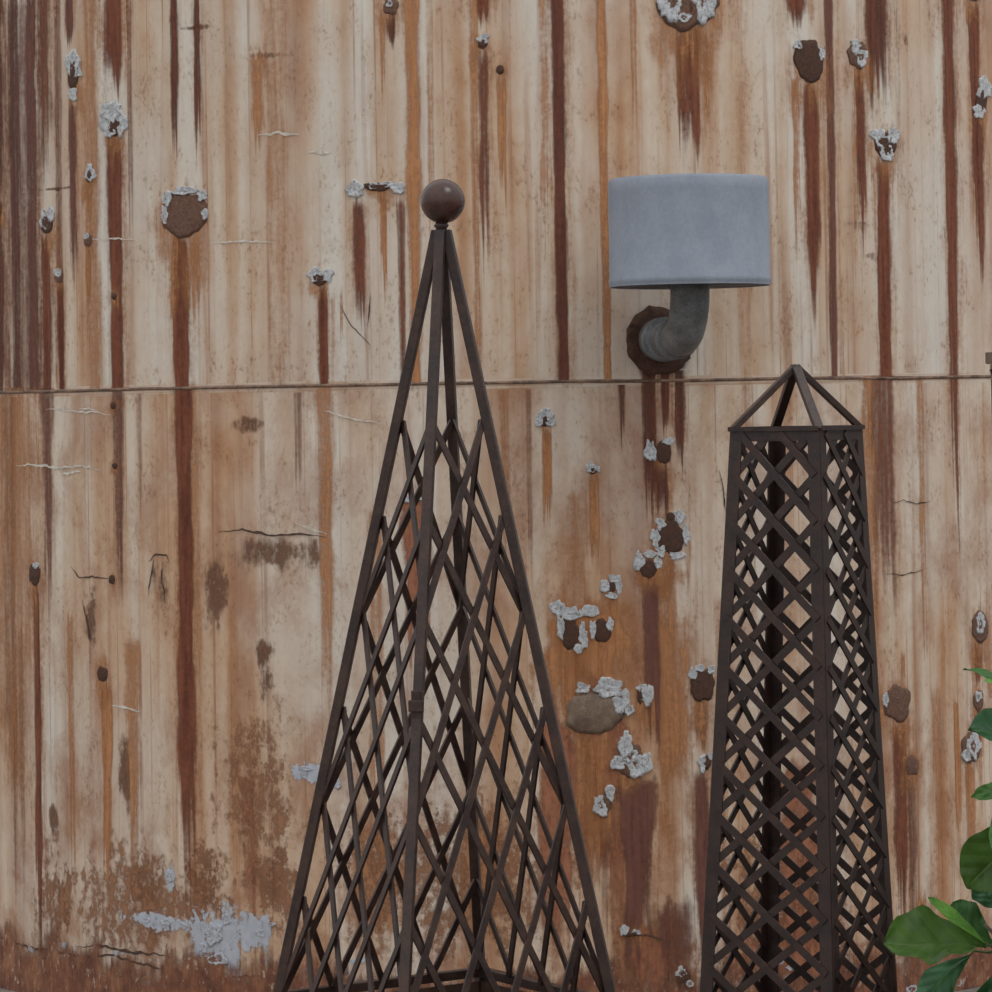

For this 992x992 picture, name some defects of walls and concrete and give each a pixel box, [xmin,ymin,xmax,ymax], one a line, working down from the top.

peeling [656,0,722,155]
rust [787,0,838,376]
peeling [846,39,900,376]
rust [0,0,297,992]
crack [220,528,322,537]
rust [343,495,634,959]
peeling [549,574,623,715]
peeling [633,550,663,740]
rust [636,370,716,779]
peeling [118,900,276,976]
peeling [591,730,661,966]
rust [896,946,992,992]